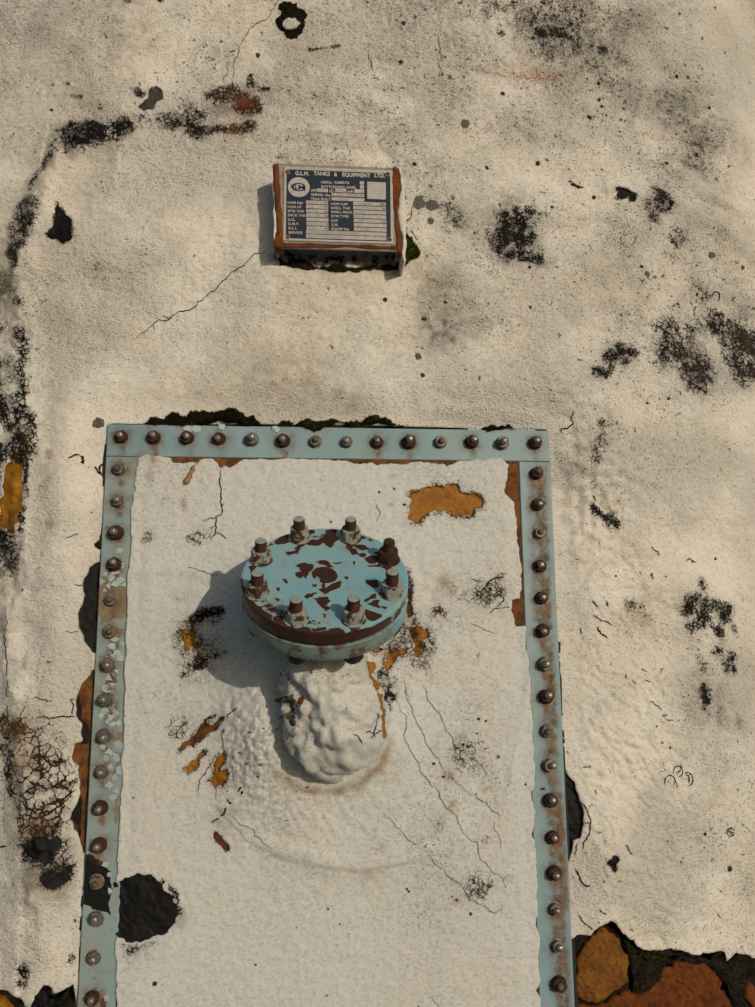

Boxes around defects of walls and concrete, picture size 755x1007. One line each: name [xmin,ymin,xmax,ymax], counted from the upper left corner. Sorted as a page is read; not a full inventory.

crack [0,0,278,581]
peeling [405,482,486,526]
peeling [176,713,262,790]
peeling [248,694,305,737]
peeling [26,835,73,889]
peeling [83,854,178,942]
corrosion [544,771,568,974]